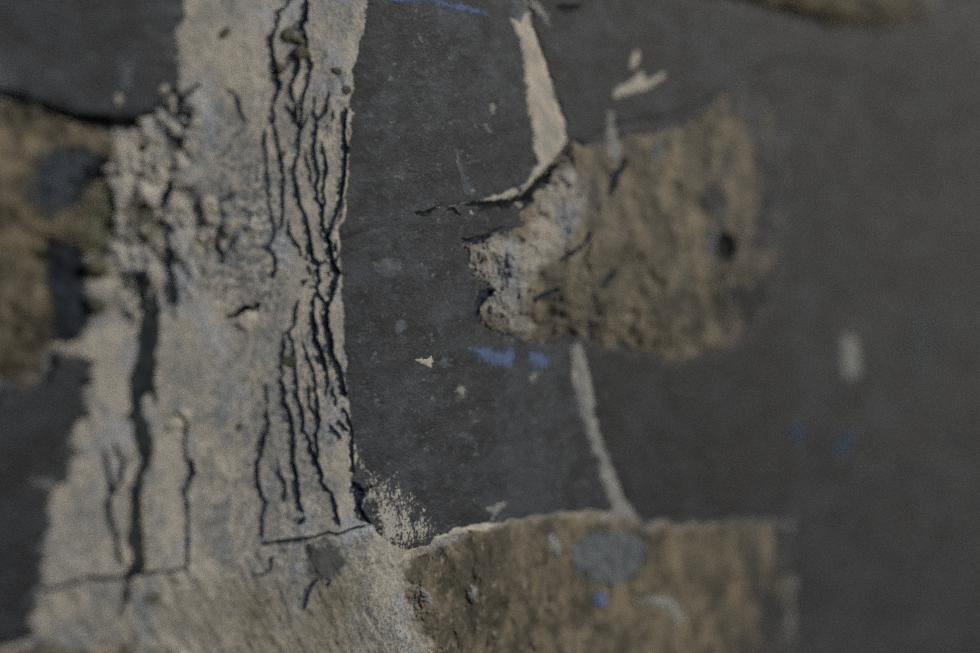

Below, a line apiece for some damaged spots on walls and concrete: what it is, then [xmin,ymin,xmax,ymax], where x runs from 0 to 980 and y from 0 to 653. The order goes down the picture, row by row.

crack [0,83,199,208]
flaking render [345,108,355,139]
flaking render [451,0,567,215]
flaking render [331,154,349,258]
crack [171,0,371,576]
peeling [416,356,448,368]
crack [38,411,198,592]
peeling [429,501,507,546]
crack [302,580,331,610]